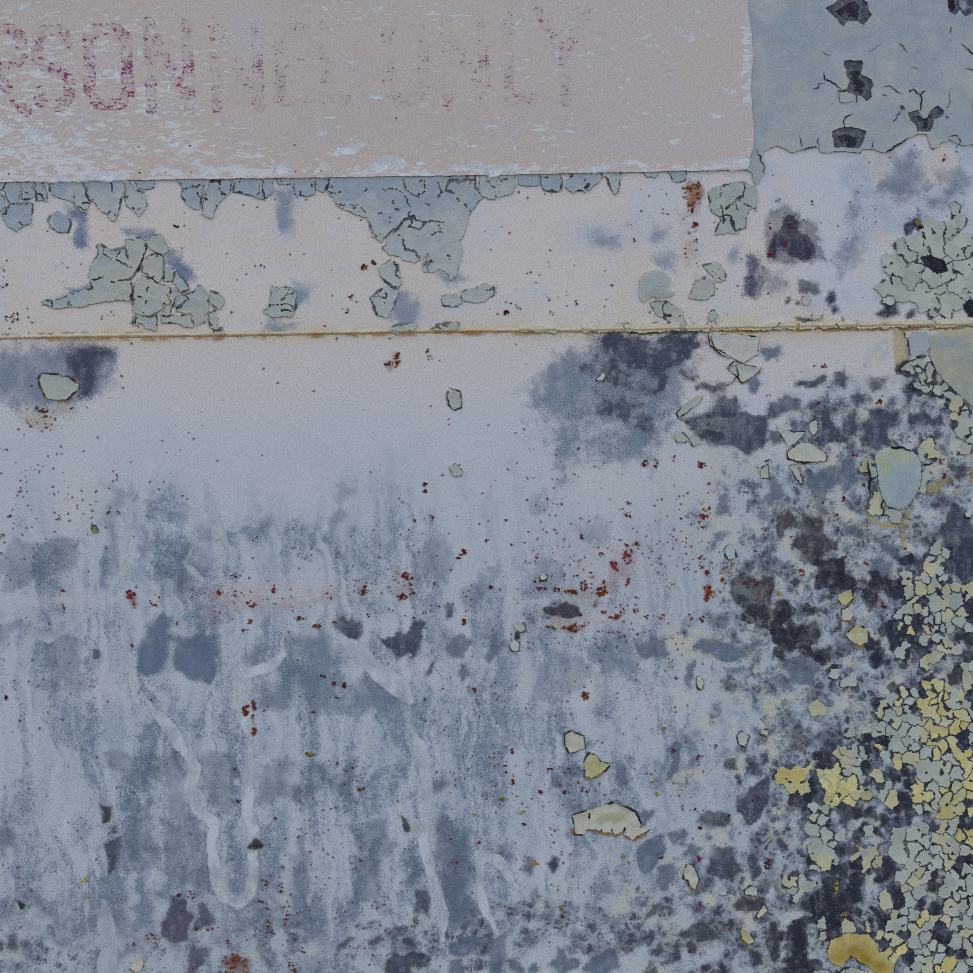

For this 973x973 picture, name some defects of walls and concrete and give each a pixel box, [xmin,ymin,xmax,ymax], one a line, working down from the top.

spalling [826,0,872,26]
crack [814,52,857,127]
crack [871,43,926,153]
peeling [0,180,155,233]
peeling [41,234,226,337]
peeling [177,172,621,335]
corrosion [682,181,704,266]
corrosion [533,538,640,597]
corrosion [684,555,725,602]
damp [138,613,218,684]
damp [145,627,340,910]
damp [407,727,519,943]